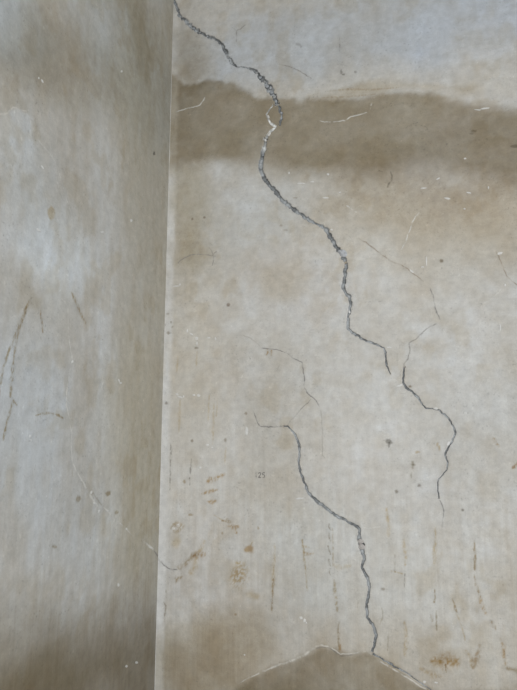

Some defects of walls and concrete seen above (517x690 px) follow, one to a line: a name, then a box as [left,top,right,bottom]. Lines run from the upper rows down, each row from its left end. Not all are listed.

crack [173,0,458,528]
water stain [167,71,517,289]
crack [242,334,438,690]